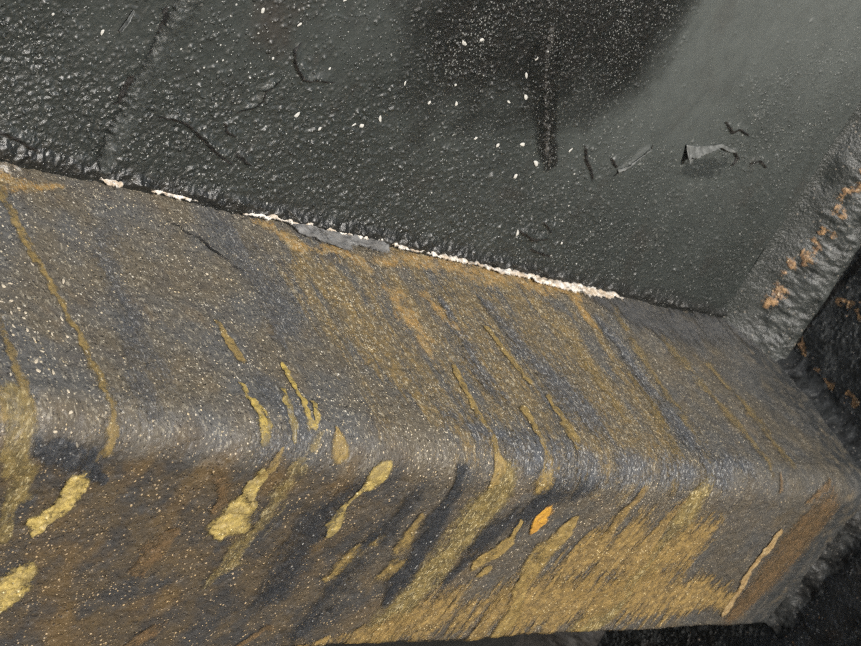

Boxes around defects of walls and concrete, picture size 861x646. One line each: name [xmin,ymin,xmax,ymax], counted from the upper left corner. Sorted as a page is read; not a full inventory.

leakage [414,0,687,171]
leakage [101,177,124,187]
leakage [152,190,197,201]
crack [169,221,243,271]
leakage [243,213,313,226]
peeling [686,144,737,165]
corrosion [0,317,38,544]
corrosion [239,382,274,447]
corrosion [253,221,838,646]
corrosion [26,472,90,538]
corrosion [207,447,284,541]
corrosion [0,562,37,614]